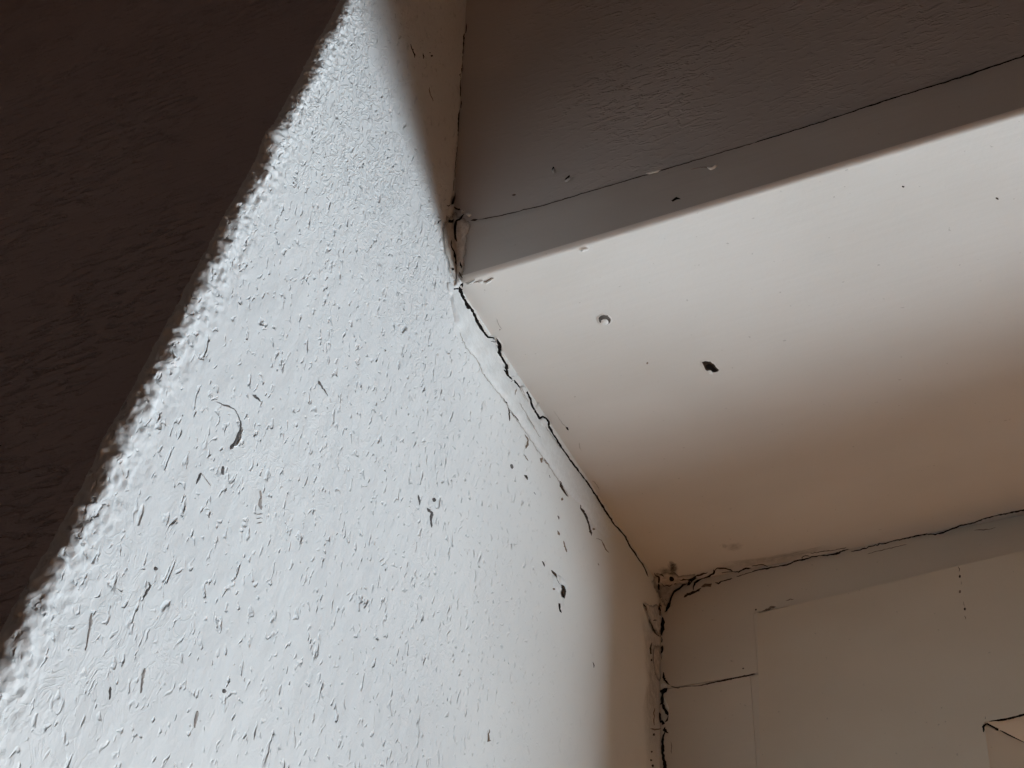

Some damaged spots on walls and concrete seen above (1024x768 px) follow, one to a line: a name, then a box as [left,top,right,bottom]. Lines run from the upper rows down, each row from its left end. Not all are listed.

crack [455,24,467,168]
crack [478,55,1024,220]
spalling [438,185,494,295]
crack [454,283,648,577]
crack [715,508,1024,577]
crack [649,637,755,768]
crack [982,714,1024,742]